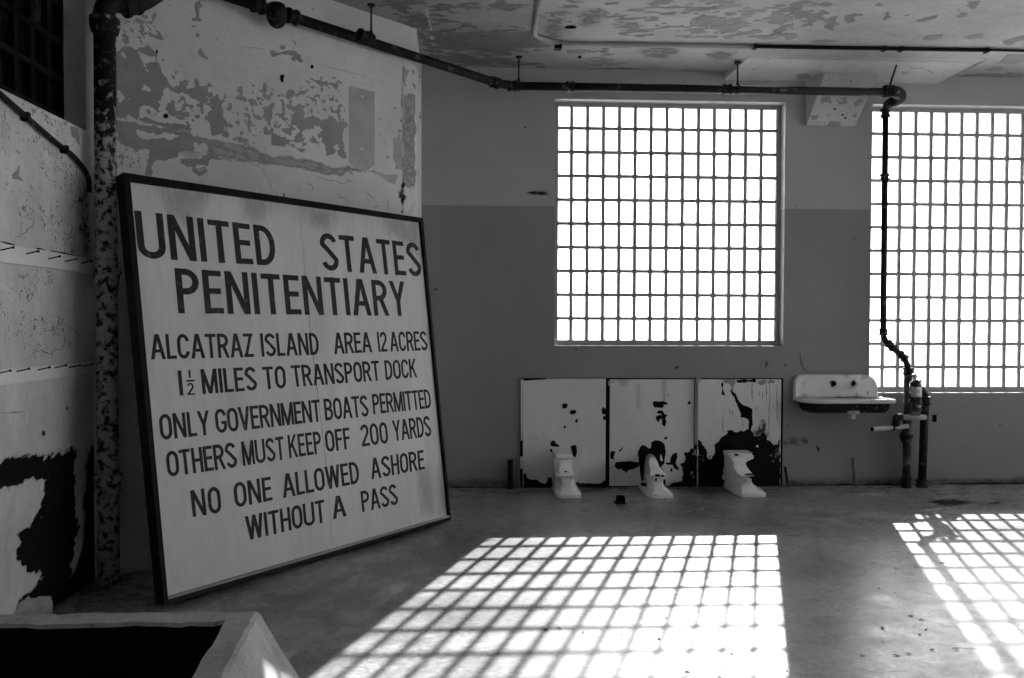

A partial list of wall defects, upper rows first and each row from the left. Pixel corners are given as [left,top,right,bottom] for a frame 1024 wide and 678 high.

peeling [377,0,863,70]
peeling [959,35,1024,77]
peeling [116,12,421,187]
peeling [523,473,553,488]
peeling [550,440,577,457]
peeling [610,379,781,487]